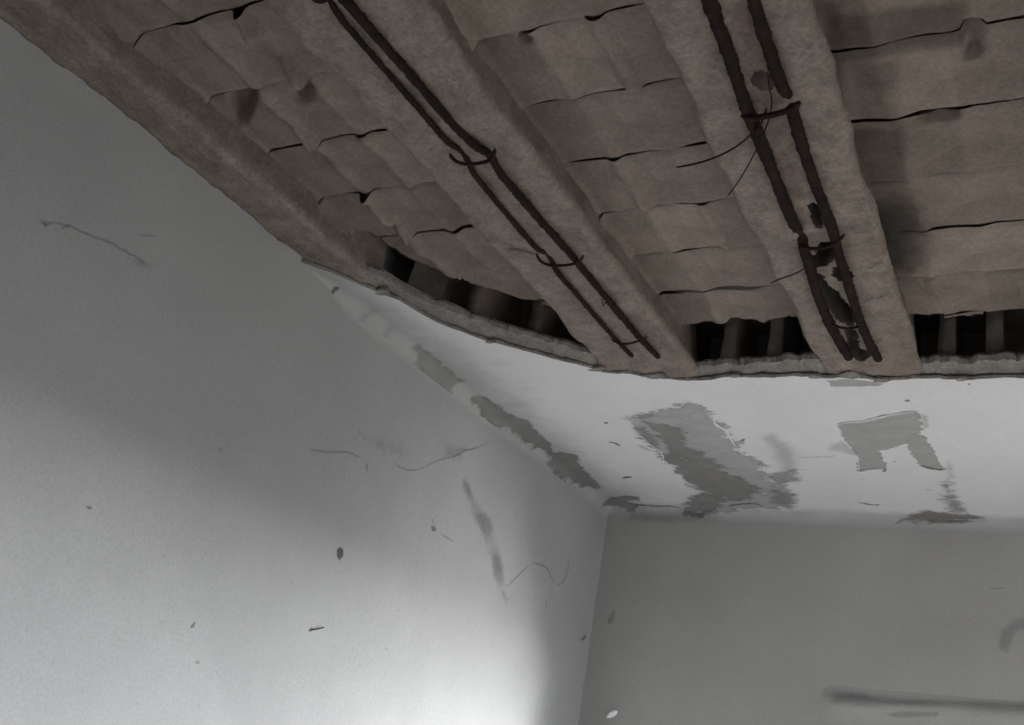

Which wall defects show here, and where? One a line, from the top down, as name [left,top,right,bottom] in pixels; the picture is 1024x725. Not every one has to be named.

spalling [750,69,776,91]
spalling [807,202,825,229]
spalling [298,241,1024,387]
peeling [628,403,797,515]
peeling [837,400,946,472]